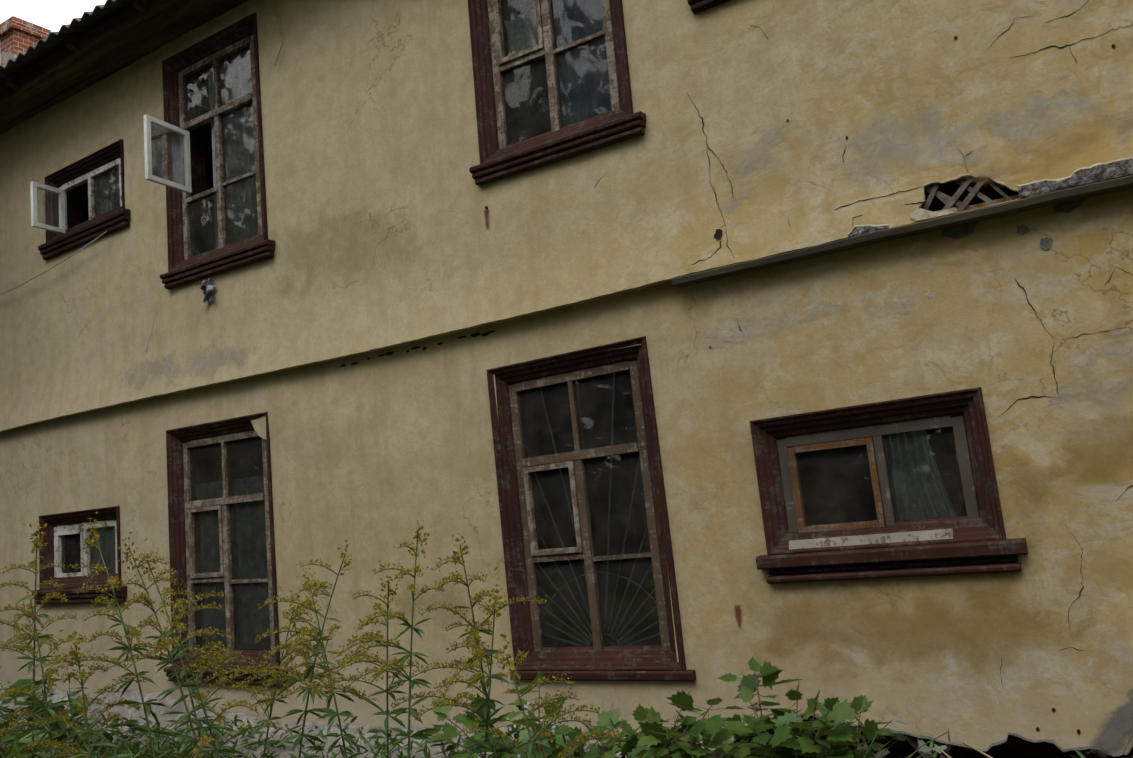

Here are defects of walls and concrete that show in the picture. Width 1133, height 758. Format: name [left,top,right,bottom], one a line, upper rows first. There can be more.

crack [988,0,1133,64]
crack [679,93,734,269]
spalling [848,224,889,238]
crack [837,187,927,222]
spalling [909,157,1133,250]
crack [1001,278,1133,415]
crack [1059,528,1086,651]
spalling [844,720,890,758]
peeling [878,699,1133,758]